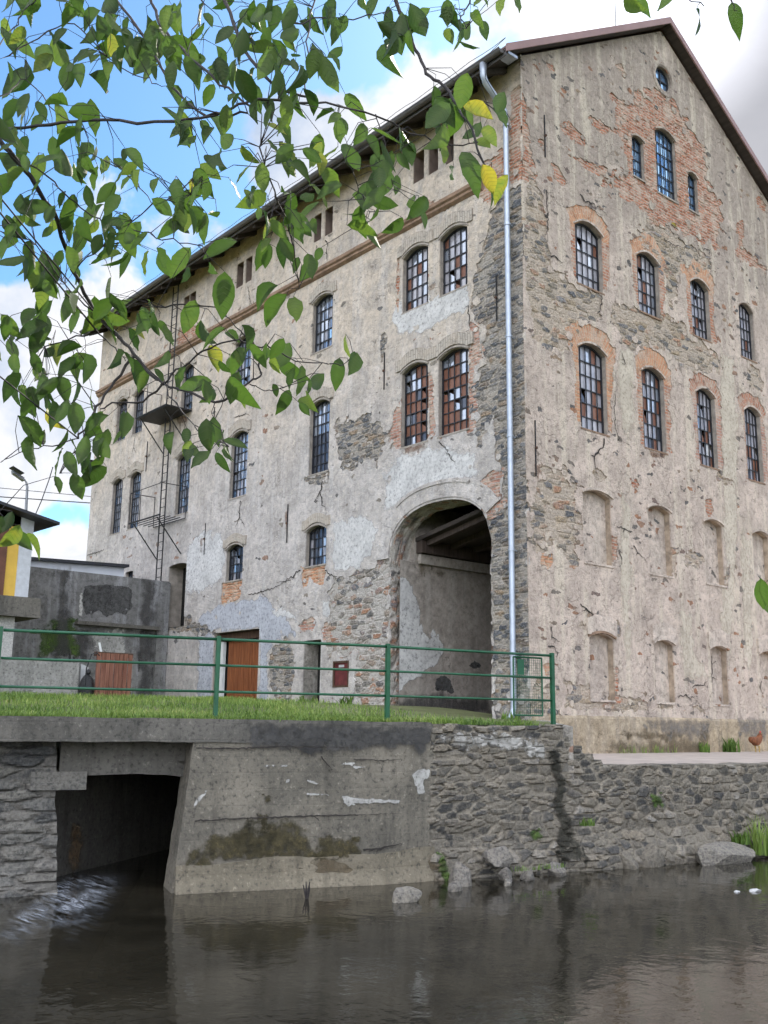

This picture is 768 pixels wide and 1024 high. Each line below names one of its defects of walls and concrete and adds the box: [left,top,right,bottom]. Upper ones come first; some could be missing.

flaking render [304,85,766,720]
water stain [54,571,154,696]
crack [248,570,300,595]
flaking render [168,515,454,705]
water stain [250,724,588,865]
water stain [299,859,353,873]